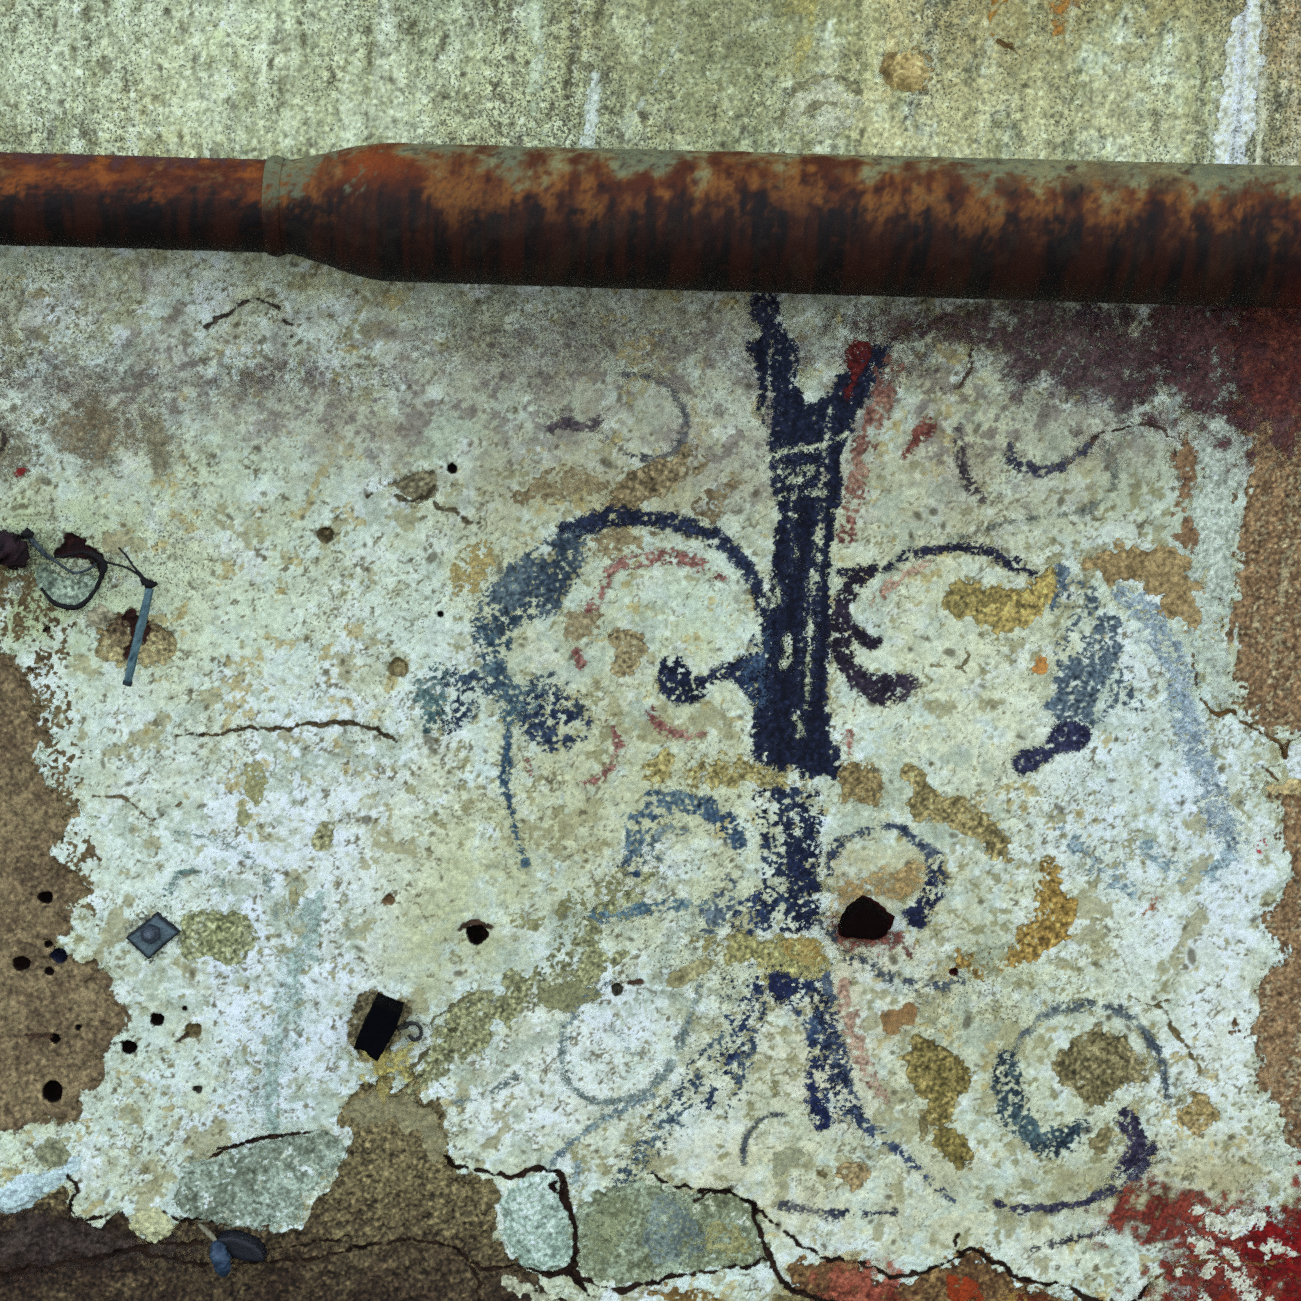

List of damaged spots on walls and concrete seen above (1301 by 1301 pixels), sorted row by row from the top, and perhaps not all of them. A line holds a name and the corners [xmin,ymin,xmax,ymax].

rust [1049,0,1076,35]
peeling [507,443,742,562]
peeling [941,567,1058,640]
crack [175,719,398,743]
flaking render [1080,307,1301,1155]
peeling [900,763,1014,864]
flaking render [0,529,793,1301]
peeling [949,856,1078,982]
peeling [880,1002,979,1171]
peeling [1051,1024,1150,1108]
crack [0,1154,1299,1301]
flaking render [772,1247,1078,1301]